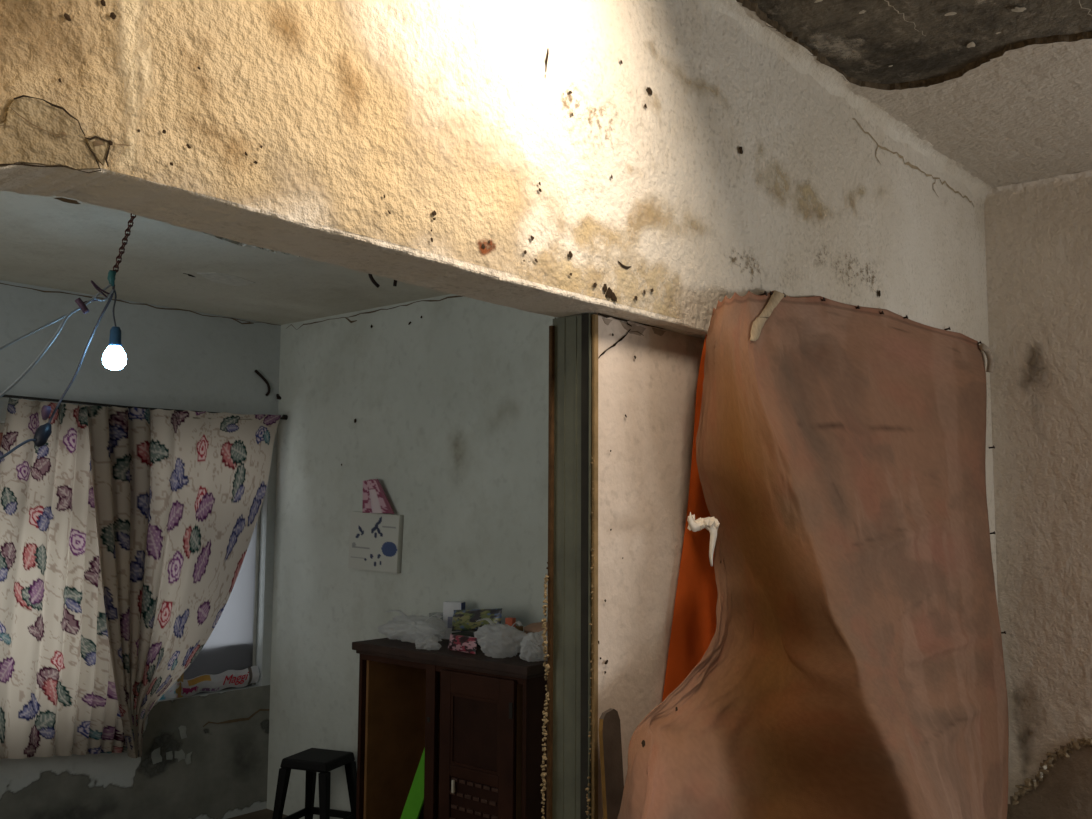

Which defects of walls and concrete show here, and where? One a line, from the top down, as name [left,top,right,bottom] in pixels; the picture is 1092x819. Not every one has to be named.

flaking render [736,0,1092,90]
damp [0,0,529,270]
crack [852,118,974,206]
corrosion [478,240,495,254]
damp [522,252,679,319]
damp [575,204,669,245]
peeling [0,685,270,819]